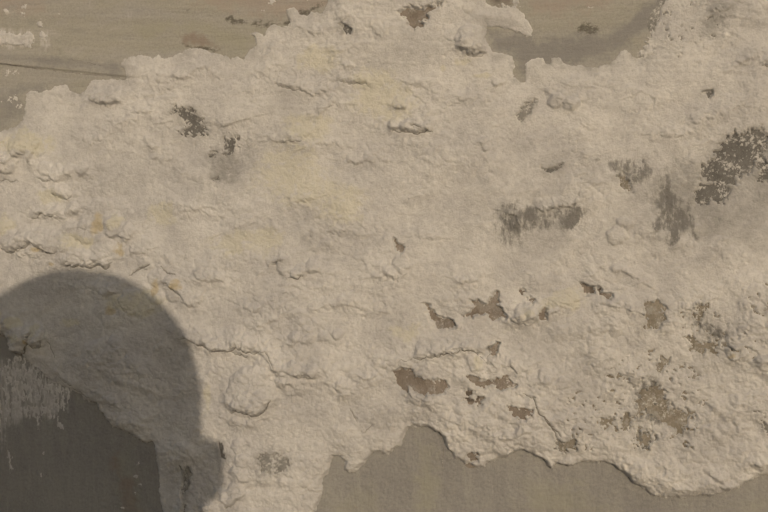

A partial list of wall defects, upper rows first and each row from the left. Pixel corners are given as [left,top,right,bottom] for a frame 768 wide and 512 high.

peeling [171,105,208,138]
leakage [324,54,436,136]
leakage [194,144,262,191]
leakage [233,114,359,225]
leakage [473,170,602,260]
leakage [623,112,768,269]
peeling [694,129,768,206]
leakage [531,281,601,319]
crack [177,338,273,368]
peeling [393,368,448,396]
peeling [465,375,517,407]
spalling [553,373,705,454]